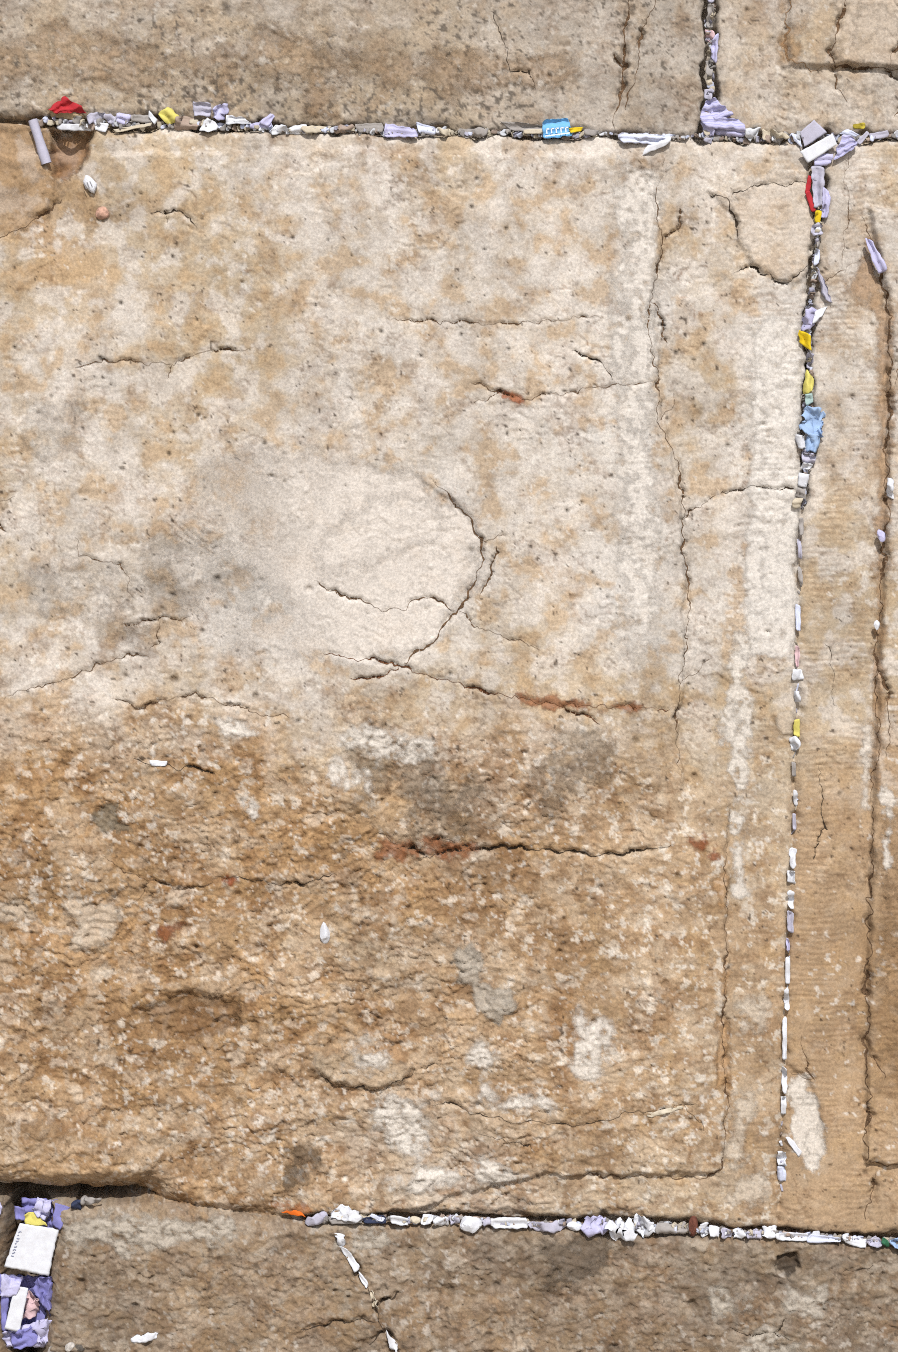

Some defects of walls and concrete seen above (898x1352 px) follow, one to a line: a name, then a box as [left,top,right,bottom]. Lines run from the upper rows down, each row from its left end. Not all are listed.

crack [612,0,656,128]
crack [780,0,898,101]
crack [317,159,793,767]
crack [710,157,898,1220]
crack [322,806,730,1180]